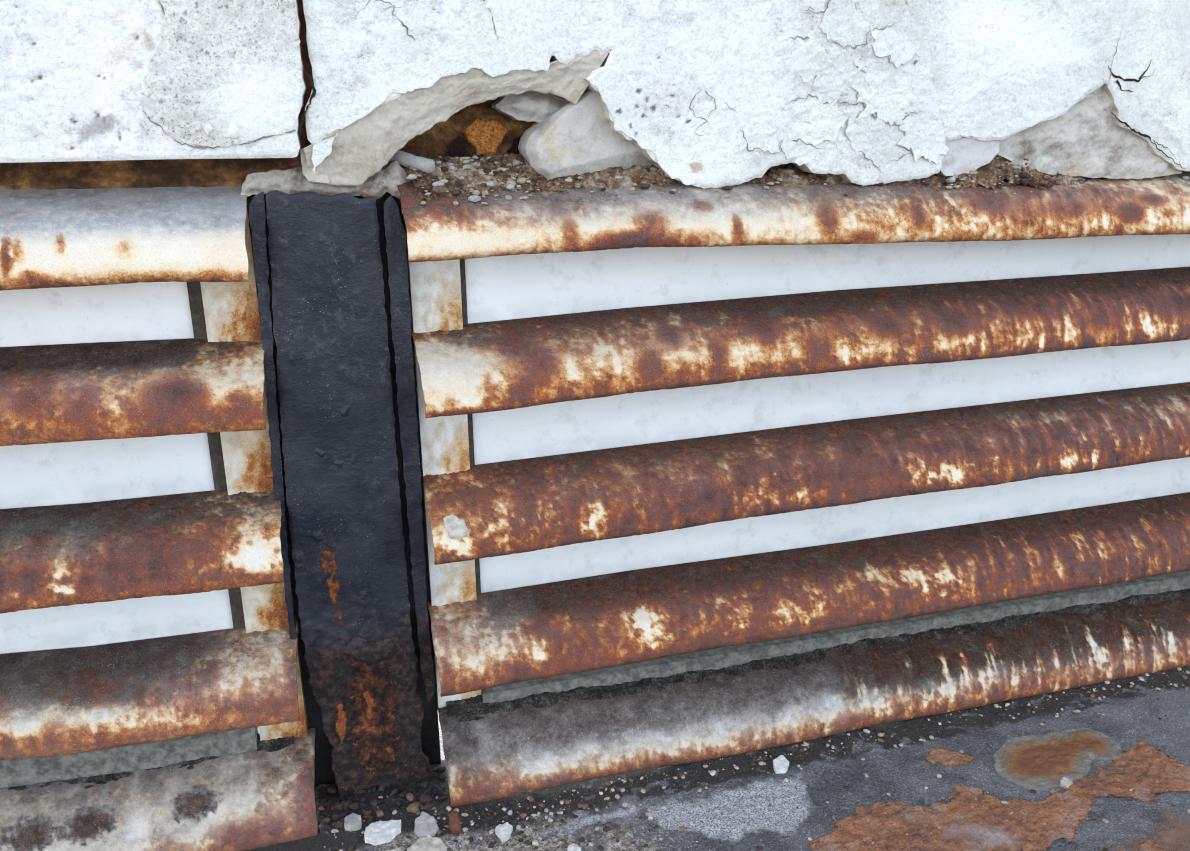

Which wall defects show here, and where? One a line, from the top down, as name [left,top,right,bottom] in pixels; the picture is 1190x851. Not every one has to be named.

peeling [137,0,303,149]
crack [281,0,316,166]
crack [355,0,415,40]
spalling [300,46,700,186]
peeling [742,0,1182,179]
crack [1108,33,1185,169]
corrosion [321,544,344,625]
corrosion [335,636,410,776]
corrosion [809,738,1190,851]